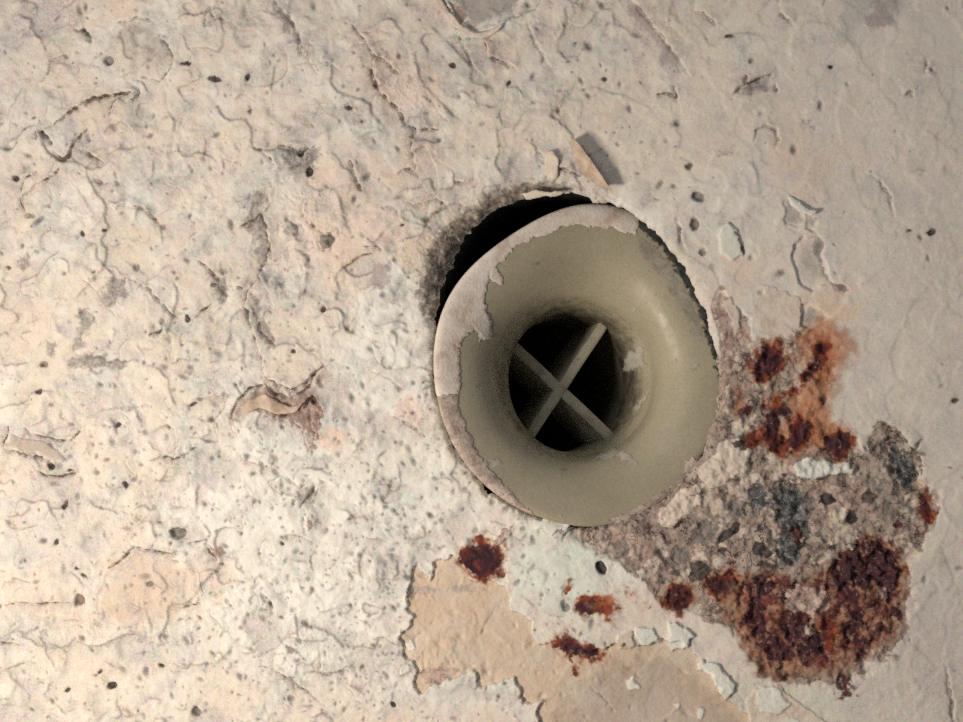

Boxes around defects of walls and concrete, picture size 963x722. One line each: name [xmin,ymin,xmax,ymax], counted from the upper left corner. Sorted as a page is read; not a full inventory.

spalling [435,0,516,39]
crack [20,90,138,208]
crack [199,214,274,345]
crack [3,427,79,477]
peeling [239,394,303,414]
crack [230,367,322,434]
spalling [533,285,940,661]
corrosion [743,321,856,462]
corrosion [457,526,511,583]
corrosion [564,579,621,621]
peeling [399,554,865,722]
corrosion [704,533,909,700]